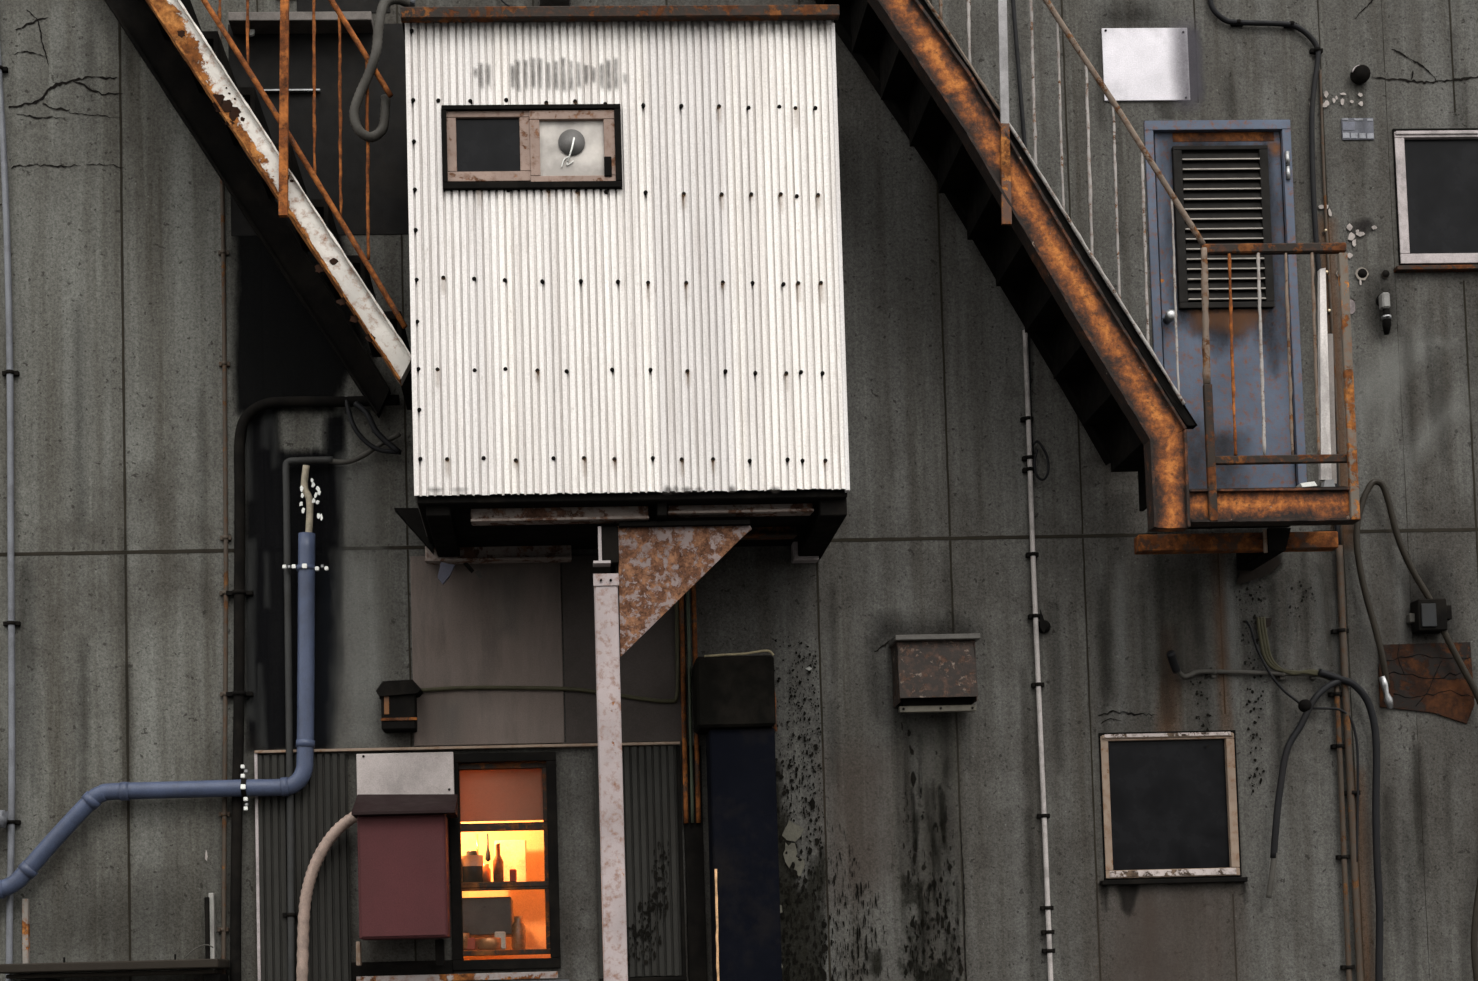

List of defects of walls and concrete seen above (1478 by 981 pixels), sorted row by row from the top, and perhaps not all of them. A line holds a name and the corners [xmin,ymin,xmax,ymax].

crack [9,10,122,119]
crack [1373,49,1478,84]
damp [776,650,888,981]